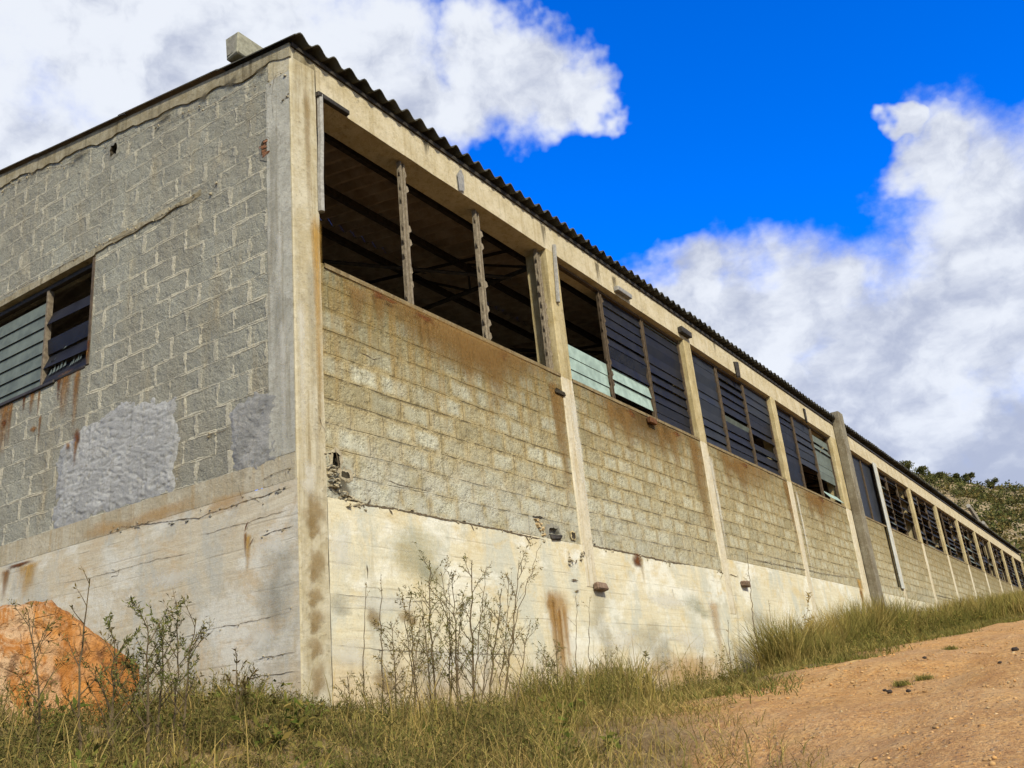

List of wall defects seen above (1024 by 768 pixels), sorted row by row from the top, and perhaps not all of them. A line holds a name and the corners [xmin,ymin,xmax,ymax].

crack [1,63,289,193]
crack [2,181,221,297]
corrosion [1,390,40,435]
crack [110,467,291,538]
spalling [322,447,353,508]
spalling [533,516,585,566]
corrosion [3,561,35,587]
corrosion [548,598,566,642]
crack [256,652,294,681]